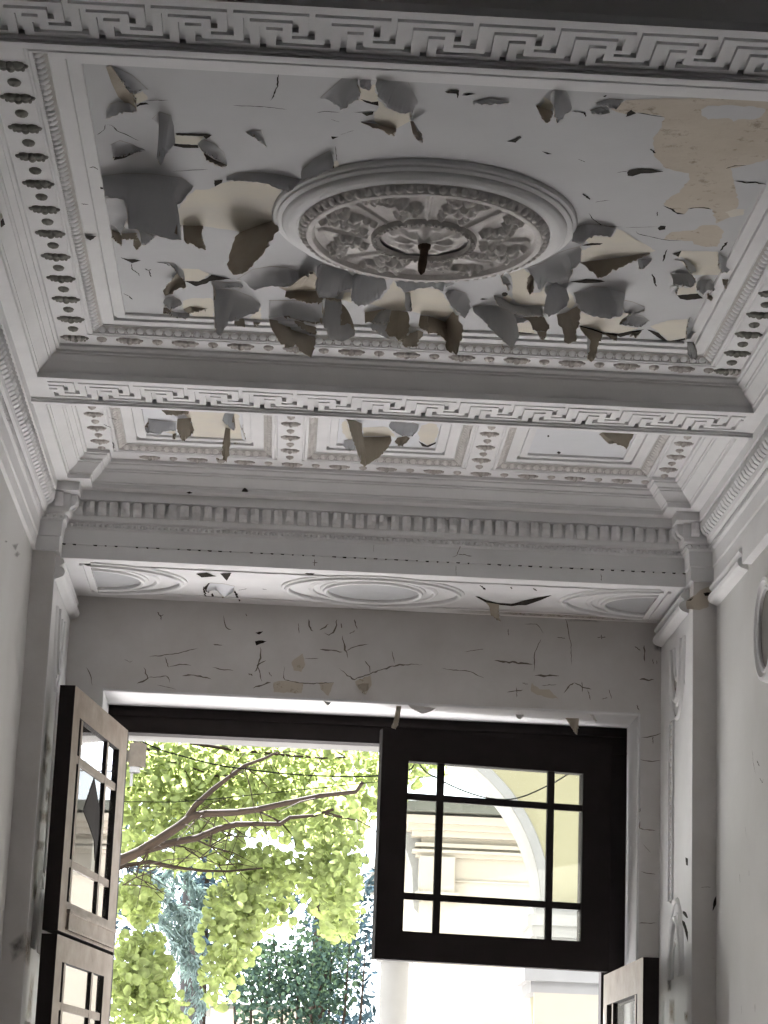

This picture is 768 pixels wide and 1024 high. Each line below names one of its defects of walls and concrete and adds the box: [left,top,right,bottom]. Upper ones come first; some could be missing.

flaking render [97,65,768,362]
peeling [145,410,246,463]
peeling [341,419,439,467]
peeling [599,432,634,449]
peeling [197,572,244,601]
peeling [476,585,551,621]
flaking render [686,586,712,610]
crack [126,615,272,689]
crack [298,620,572,680]
flaking render [273,654,334,705]
peeling [391,704,435,730]